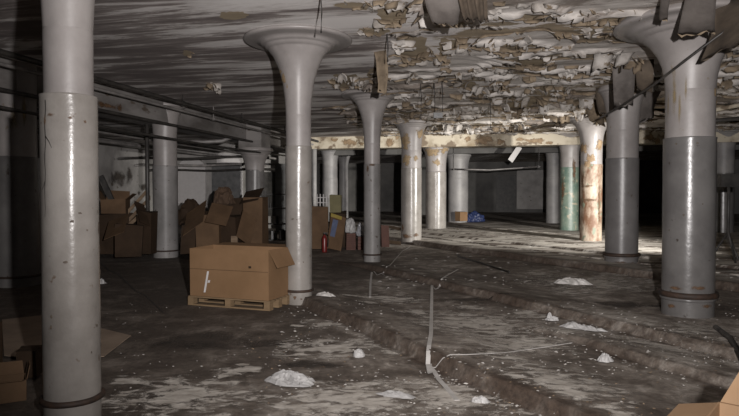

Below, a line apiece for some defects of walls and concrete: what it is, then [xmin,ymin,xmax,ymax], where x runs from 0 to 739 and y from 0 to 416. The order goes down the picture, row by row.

peeling [321,0,739,167]